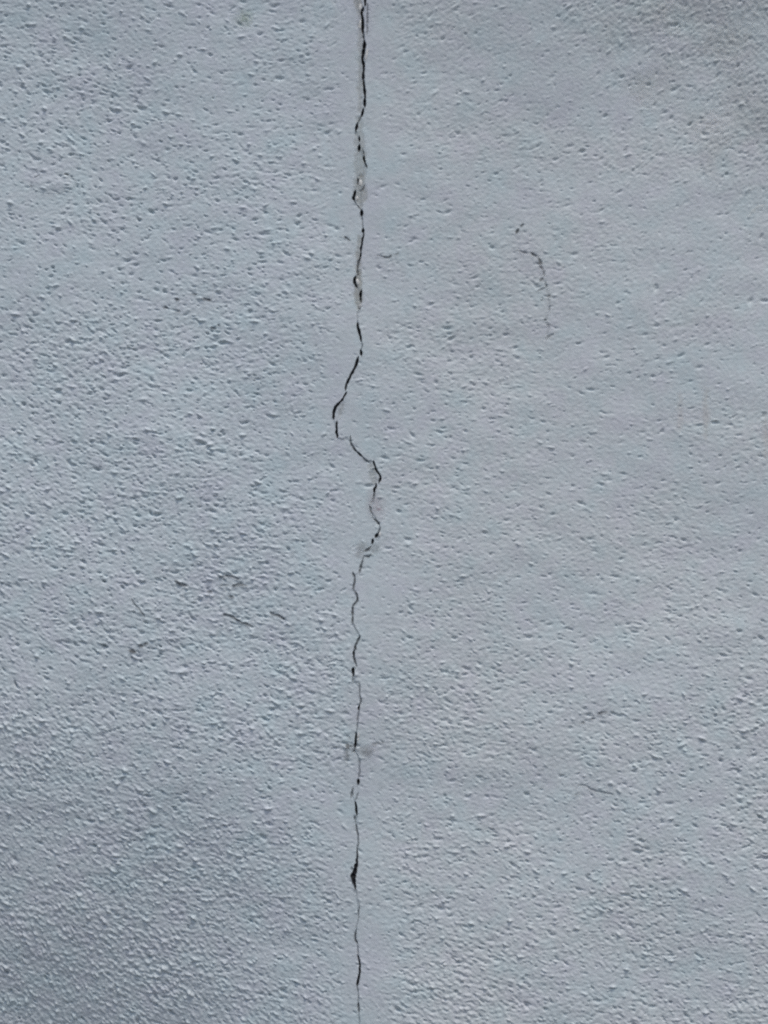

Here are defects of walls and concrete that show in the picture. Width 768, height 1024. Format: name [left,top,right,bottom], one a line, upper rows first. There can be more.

crack [332,0,381,494]
crack [352,529,381,676]
crack [351,779,360,889]
crack [354,932,362,1010]